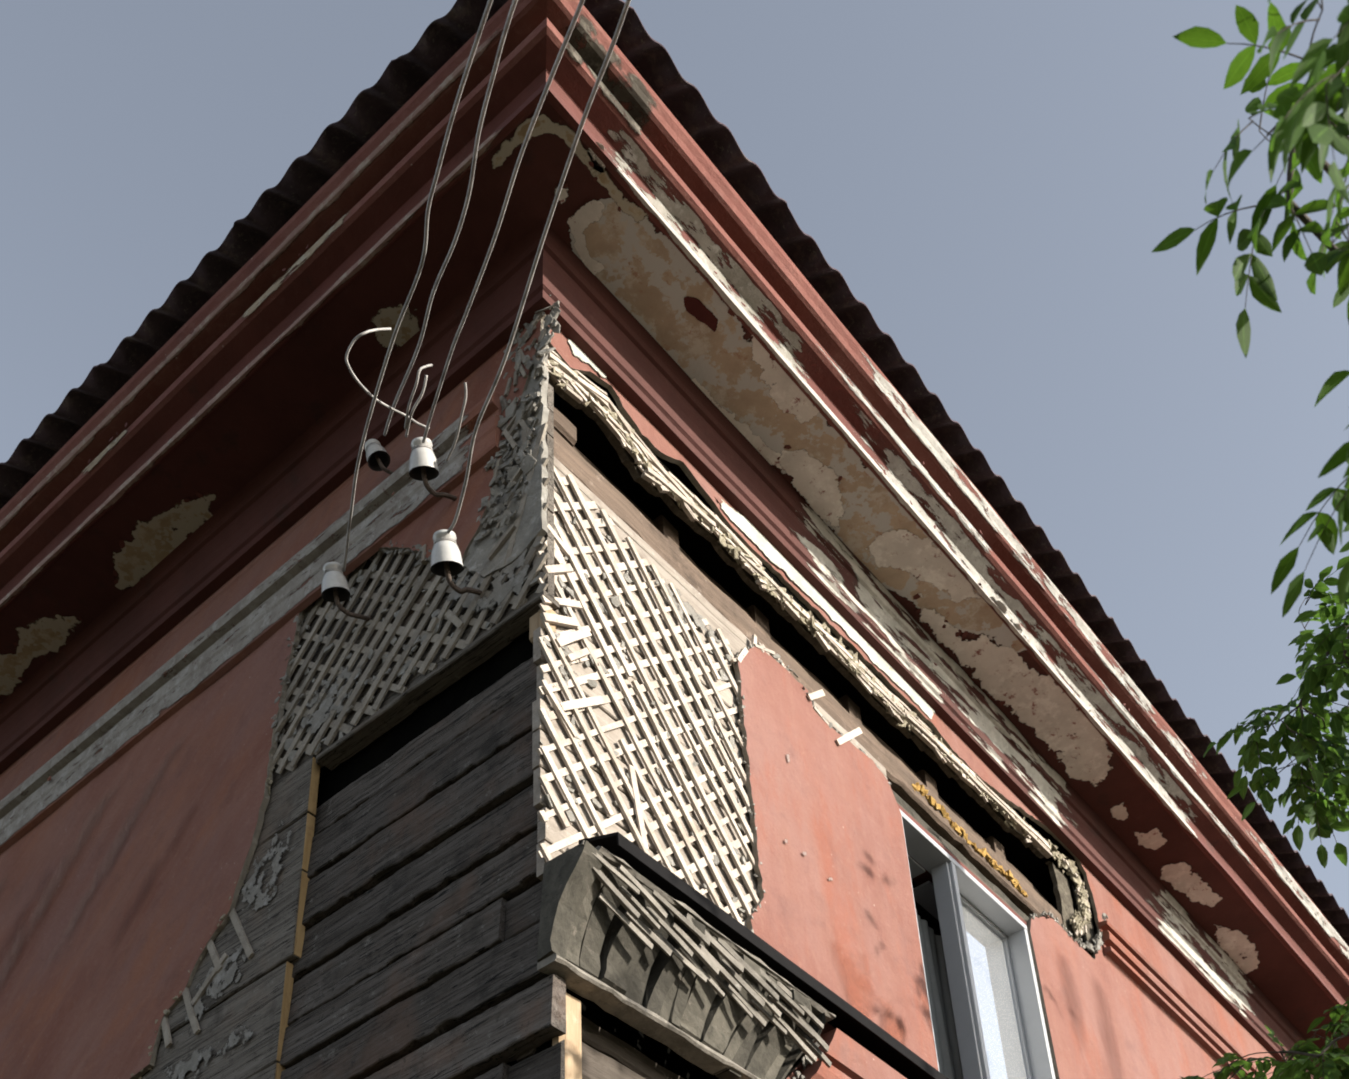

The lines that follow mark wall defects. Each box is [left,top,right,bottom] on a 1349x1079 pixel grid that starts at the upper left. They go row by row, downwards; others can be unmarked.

peeling [0,32,500,531]
peeling [0,114,1349,959]
peeling [1146,862,1260,1018]